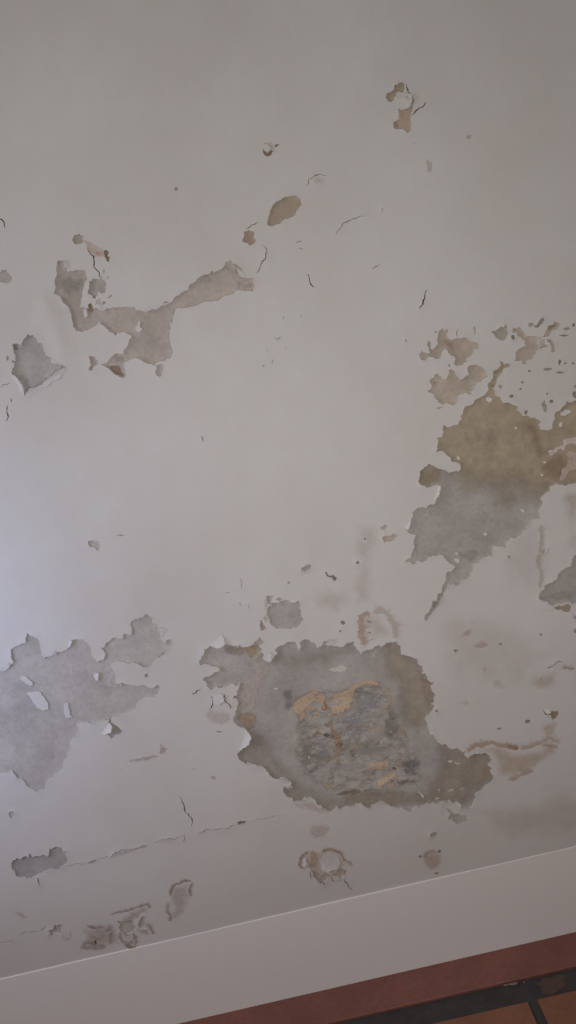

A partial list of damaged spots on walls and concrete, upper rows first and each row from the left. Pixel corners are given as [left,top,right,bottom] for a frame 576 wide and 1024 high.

peeling [386,83,426,133]
peeling [267,196,302,226]
peeling [54,260,254,378]
peeling [7,335,65,398]
peeling [380,318,576,620]
peeling [539,555,576,632]
peeling [0,614,172,791]
flaking render [199,595,493,823]
peeling [11,847,68,878]
crack [88,845,146,864]
crack [49,924,70,941]